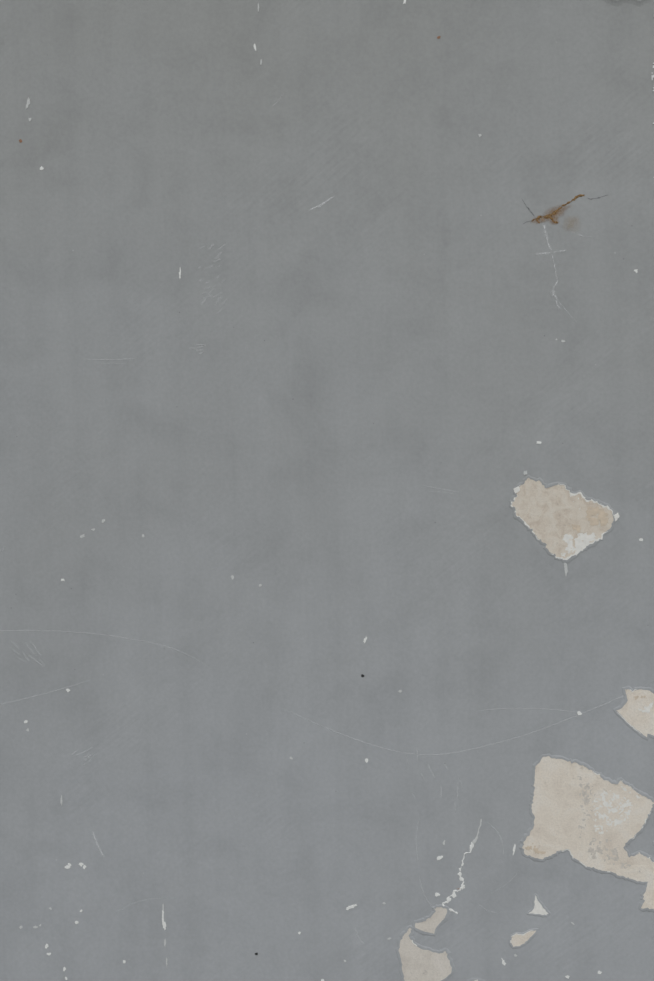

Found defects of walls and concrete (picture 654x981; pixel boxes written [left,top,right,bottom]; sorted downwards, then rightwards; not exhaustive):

peeling [509,471,620,576]
peeling [613,686,654,741]
crack [435,819,482,914]
peeling [513,753,654,913]
peeling [388,904,455,981]
peeling [501,893,551,965]